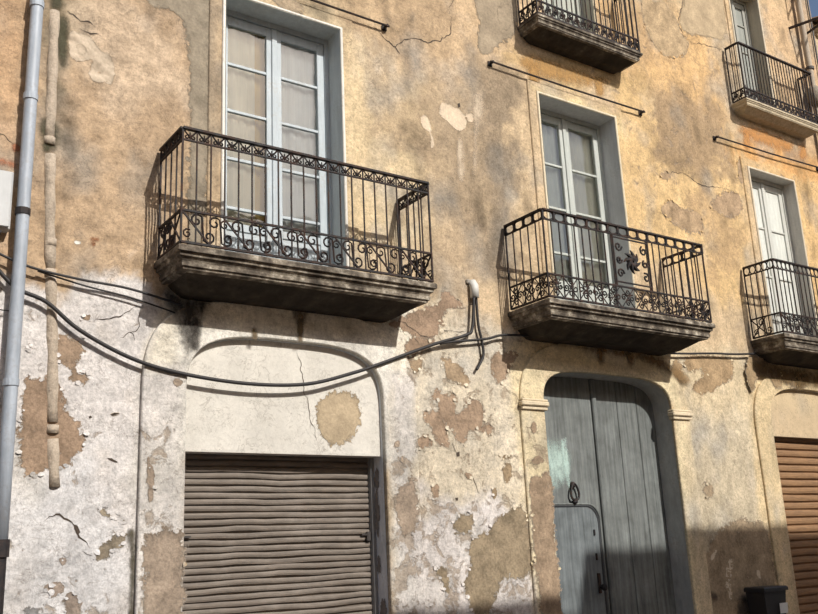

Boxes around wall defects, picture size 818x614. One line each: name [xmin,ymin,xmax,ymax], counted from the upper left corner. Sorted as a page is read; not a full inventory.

crack [376,27,451,54]
crack [99,307,140,340]
damp [163,290,207,350]
peeling [388,289,466,374]
peeling [15,314,92,478]
peeling [417,356,494,452]
peeling [671,354,735,398]
crack [47,513,92,556]
peeling [393,475,420,537]
peeling [452,454,563,614]
peeling [23,580,83,614]
peeling [140,526,189,614]